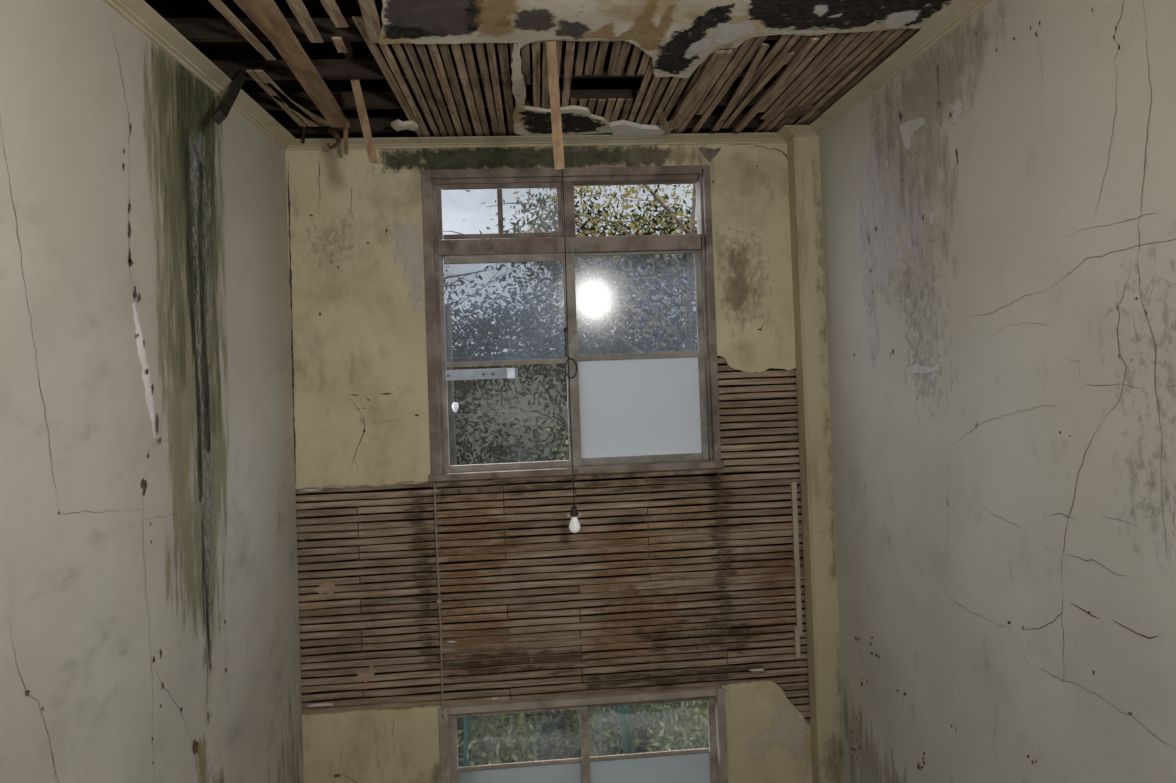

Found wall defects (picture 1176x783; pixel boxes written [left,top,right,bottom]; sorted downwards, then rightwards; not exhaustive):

crack [105,3,154,298]
flaking render [246,70,330,127]
damp [381,111,670,170]
flaking render [352,16,918,137]
flaking render [698,147,721,162]
peeling [899,117,925,149]
damp [176,63,215,501]
crack [945,0,1176,747]
crack [0,118,193,782]
damp [202,519,211,669]
flaking render [295,358,810,724]